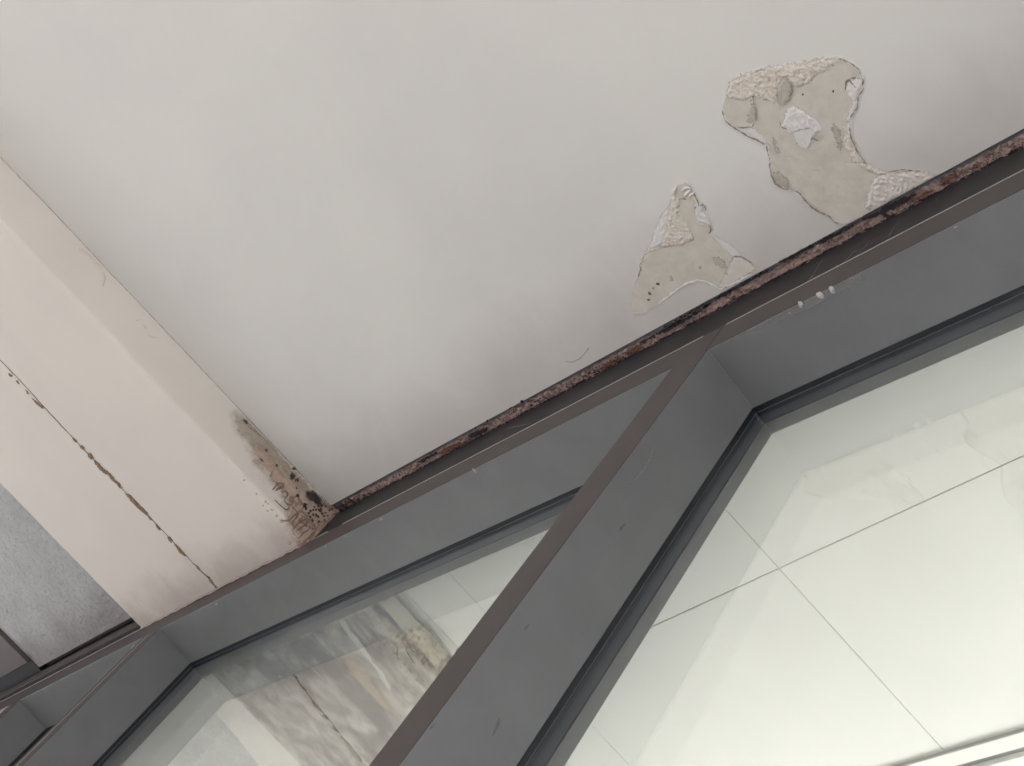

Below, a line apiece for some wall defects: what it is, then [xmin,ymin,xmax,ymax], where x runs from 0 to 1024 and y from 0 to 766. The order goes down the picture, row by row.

peeling [719,53,939,227]
peeling [627,178,761,317]
crack [0,360,88,454]
leakage [238,419,425,545]